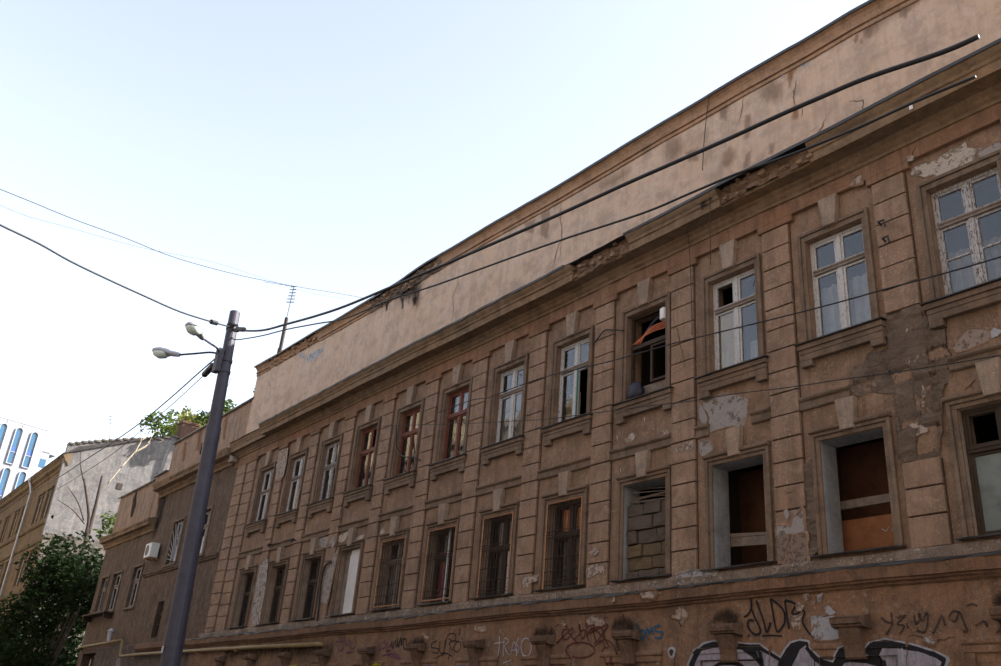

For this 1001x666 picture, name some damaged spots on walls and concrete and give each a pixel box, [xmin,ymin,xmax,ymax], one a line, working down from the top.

flaking render [907,139,1001,179]
flaking render [676,392,751,459]
flaking render [775,458,821,564]
flaking render [789,593,841,643]